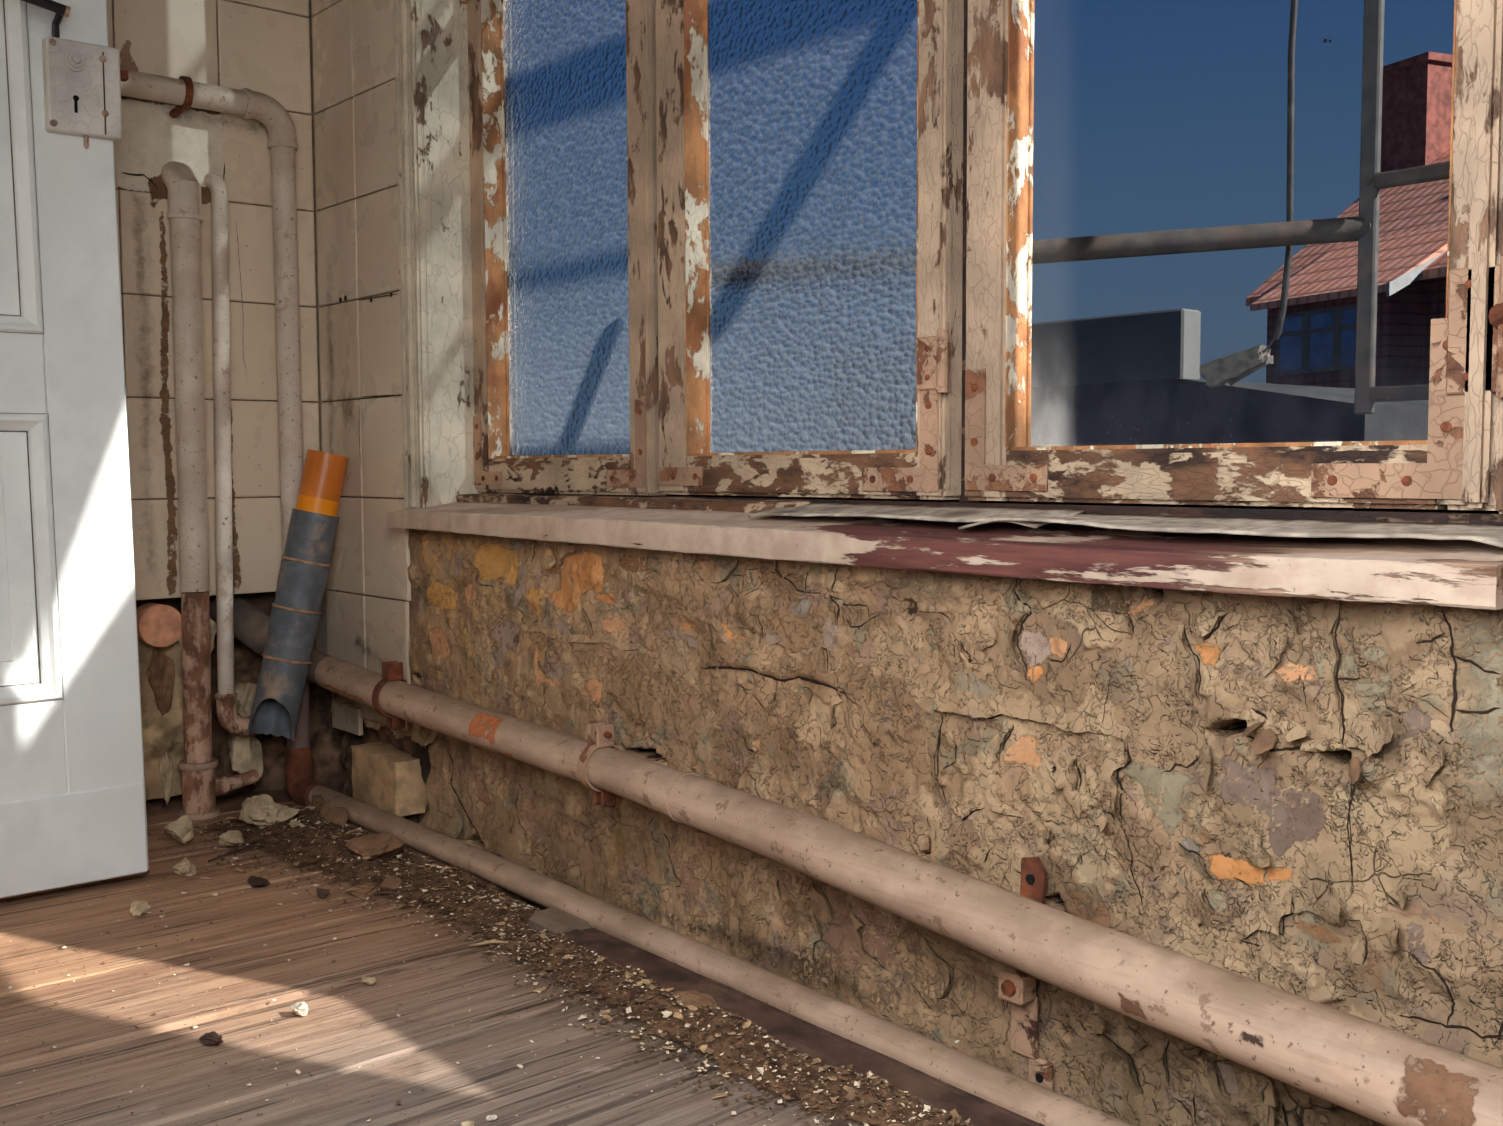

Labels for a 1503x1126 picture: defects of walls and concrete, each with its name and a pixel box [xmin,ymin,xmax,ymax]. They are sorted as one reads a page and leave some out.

peeling [426,540,648,633]
peeling [1019,630,1068,682]
crack [918,578,1208,906]
peeling [1090,583,1163,643]
crack [1168,598,1500,785]
flaking render [1261,624,1503,792]
crack [1176,842,1295,961]
crack [1347,782,1503,1045]
crack [1079,1007,1196,1123]
peeling [1240,1031,1263,1047]
crack [1256,1103,1304,1126]
peeling [1395,1055,1479,1126]